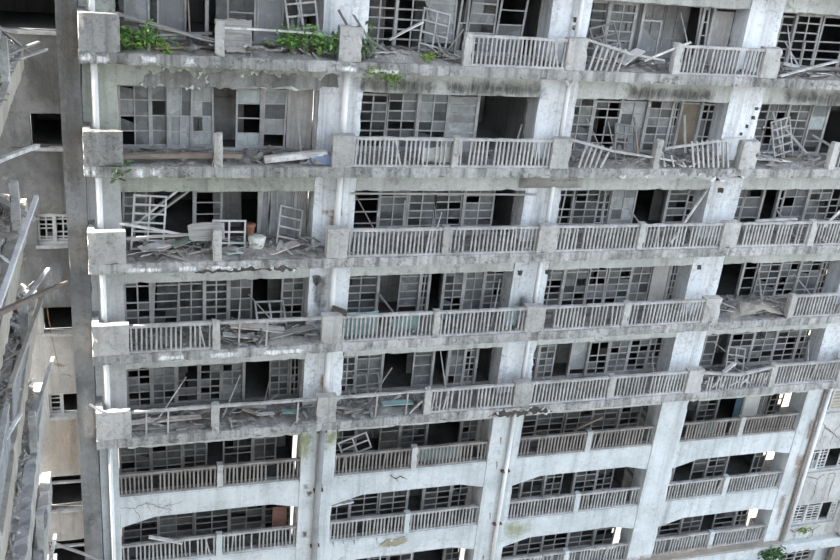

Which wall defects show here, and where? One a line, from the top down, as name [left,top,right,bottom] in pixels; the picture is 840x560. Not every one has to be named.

spalling [492,406,553,419]
peeling [380,536,408,548]